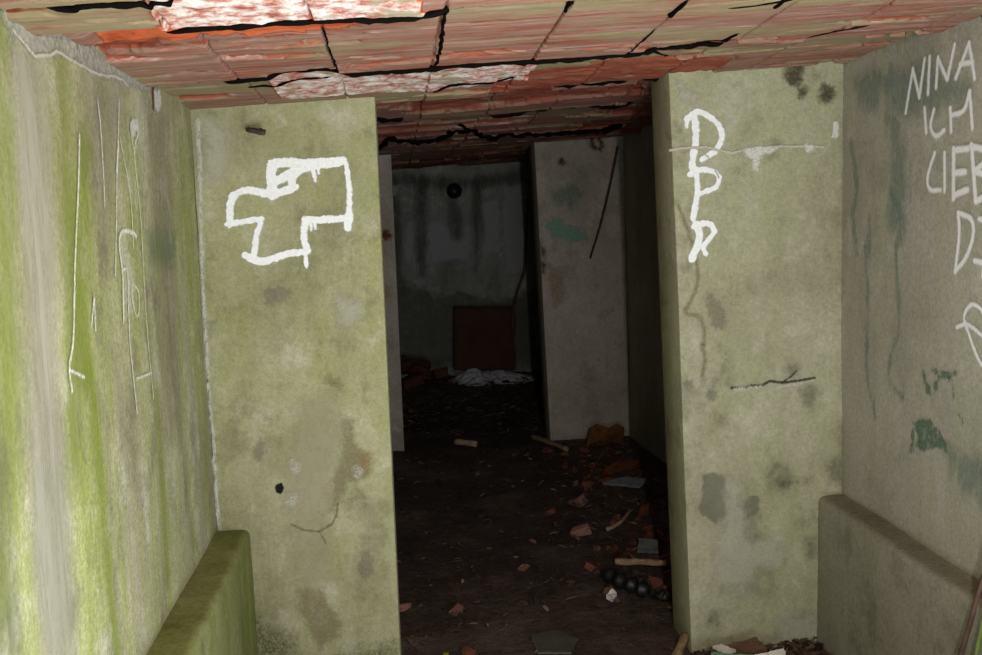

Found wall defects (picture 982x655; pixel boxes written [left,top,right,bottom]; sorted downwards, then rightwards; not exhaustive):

crack [12,28,128,87]
crack [47,0,739,150]
spalling [376,55,741,136]
crack [728,0,792,9]
leakage [785,66,806,96]
leakage [821,85,834,102]
crack [807,25,870,38]
leakage [196,118,221,530]
leakage [19,63,68,655]
leakage [910,419,947,452]
crack [291,503,339,544]
leakage [700,473,784,594]